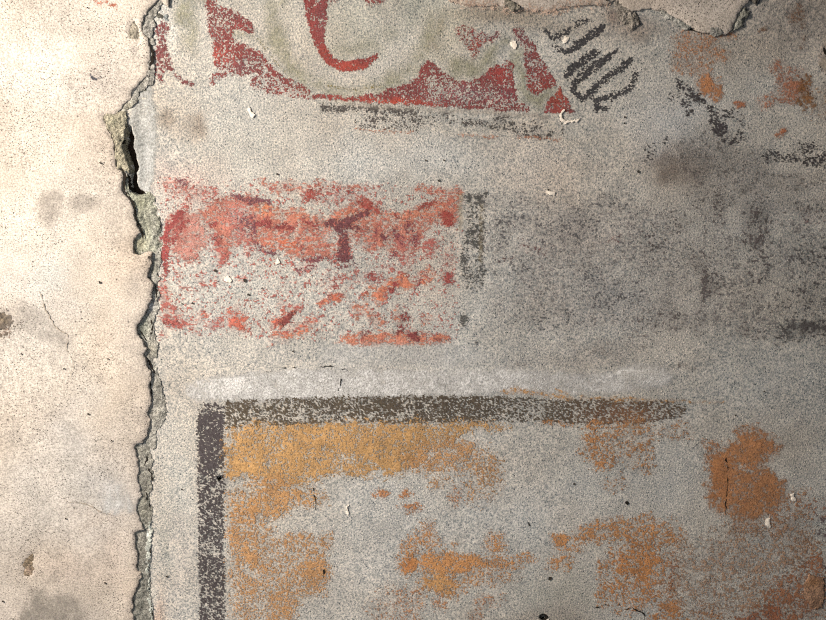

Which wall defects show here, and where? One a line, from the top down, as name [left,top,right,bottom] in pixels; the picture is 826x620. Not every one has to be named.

spalling [128,21,140,40]
spalling [104,86,163,259]
spalling [0,310,24,339]